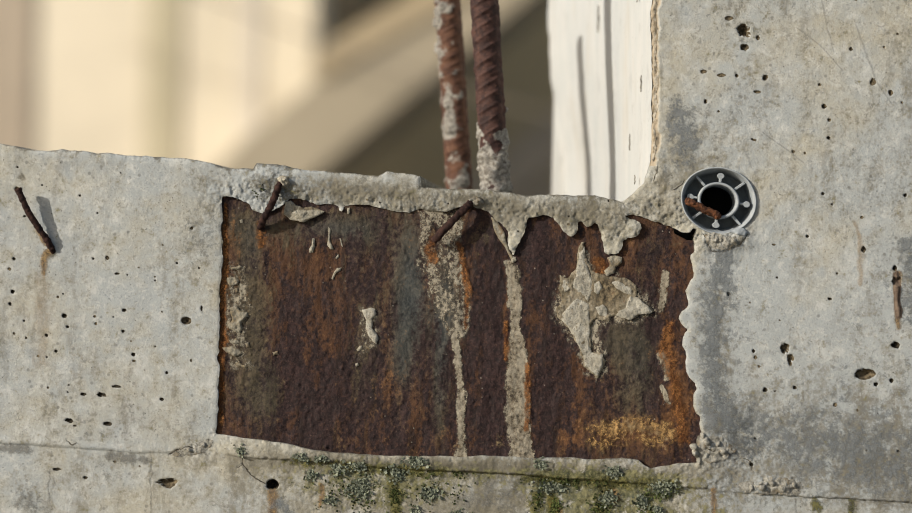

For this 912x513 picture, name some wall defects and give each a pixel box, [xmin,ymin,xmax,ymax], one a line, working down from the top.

peeling [284,201,324,222]
rust [36,230,51,275]
peeling [327,227,343,279]
peeling [491,217,517,263]
rust [217,203,229,424]
peeling [222,264,251,370]
peeling [357,308,378,353]
peeling [554,242,656,378]
rust [586,320,688,450]